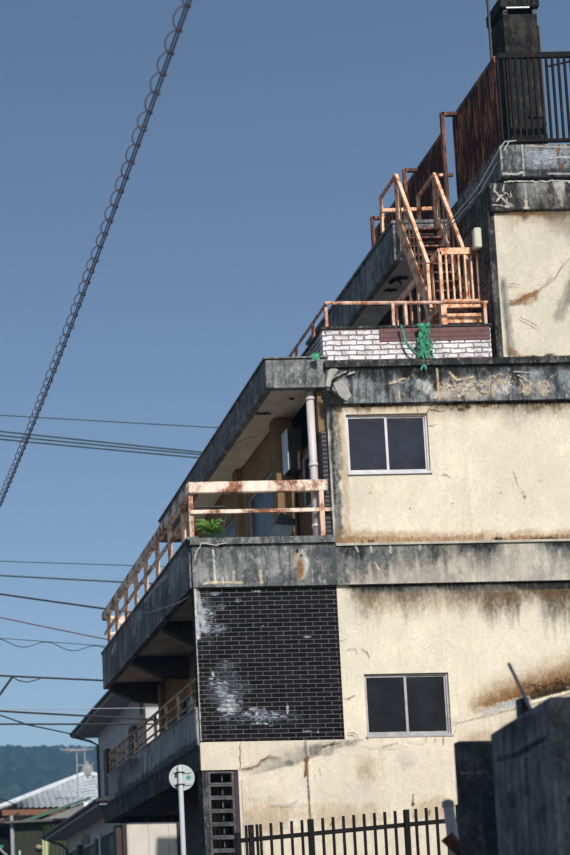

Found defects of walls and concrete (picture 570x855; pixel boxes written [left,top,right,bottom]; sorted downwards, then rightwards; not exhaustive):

crack [506,258,570,326]
spalling [321,367,356,407]
water stain [346,344,570,410]
water stain [314,405,570,609]
corrosion [293,549,309,581]
water stain [114,588,288,800]
water stain [492,678,570,709]
crack [239,742,277,770]